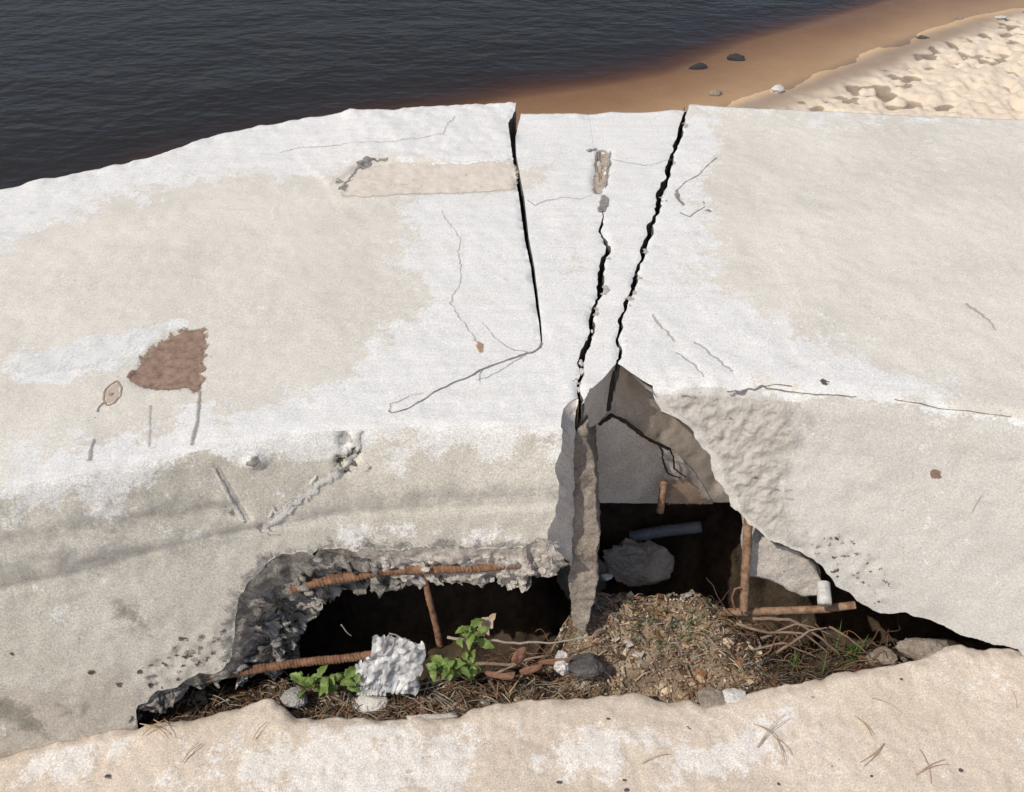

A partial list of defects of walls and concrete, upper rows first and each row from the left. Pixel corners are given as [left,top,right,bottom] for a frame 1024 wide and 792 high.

peeling [336,154,518,197]
spalling [585,148,611,212]
crack [388,108,582,413]
crack [575,106,716,478]
corrosion [127,327,208,445]
crack [727,384,857,397]
crack [895,399,1011,417]
corrosion [668,481,708,505]
corrosion [227,650,372,679]
spalling [128,535,570,723]
corrosion [290,562,520,651]
corrosion [717,518,856,617]